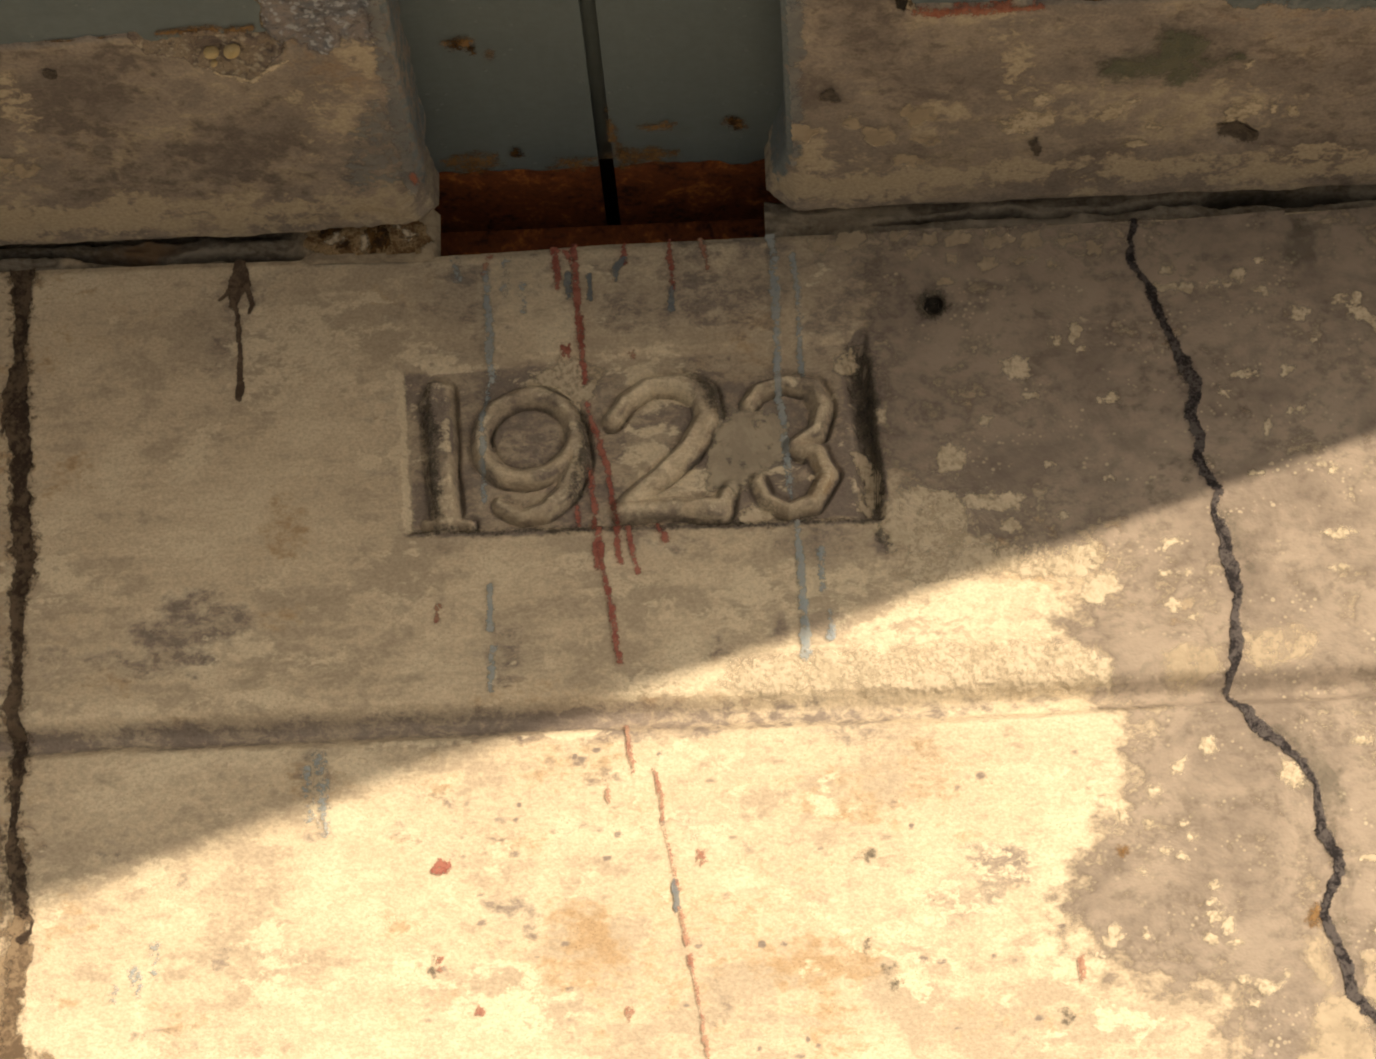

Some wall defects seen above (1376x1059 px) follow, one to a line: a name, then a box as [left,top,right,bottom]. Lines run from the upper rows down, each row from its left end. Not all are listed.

spalling [127,0,375,83]
water stain [1099,30,1246,87]
spalling [302,220,433,255]
water stain [218,260,255,402]
crack [0,268,41,1059]
water stain [854,207,1376,1059]
crack [1125,218,1376,1023]